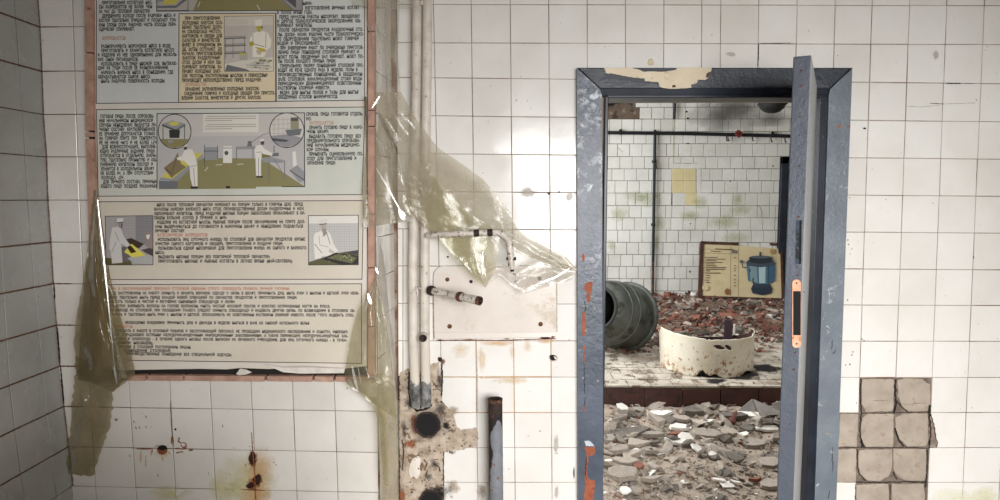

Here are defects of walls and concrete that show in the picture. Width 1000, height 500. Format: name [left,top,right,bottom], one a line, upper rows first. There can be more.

peeling [604,67,712,89]
peeling [582,254,595,412]
rust [129,400,193,465]
rust [241,432,266,500]
flaking render [398,358,478,500]
peeling [584,441,595,500]
spalling [837,378,938,500]